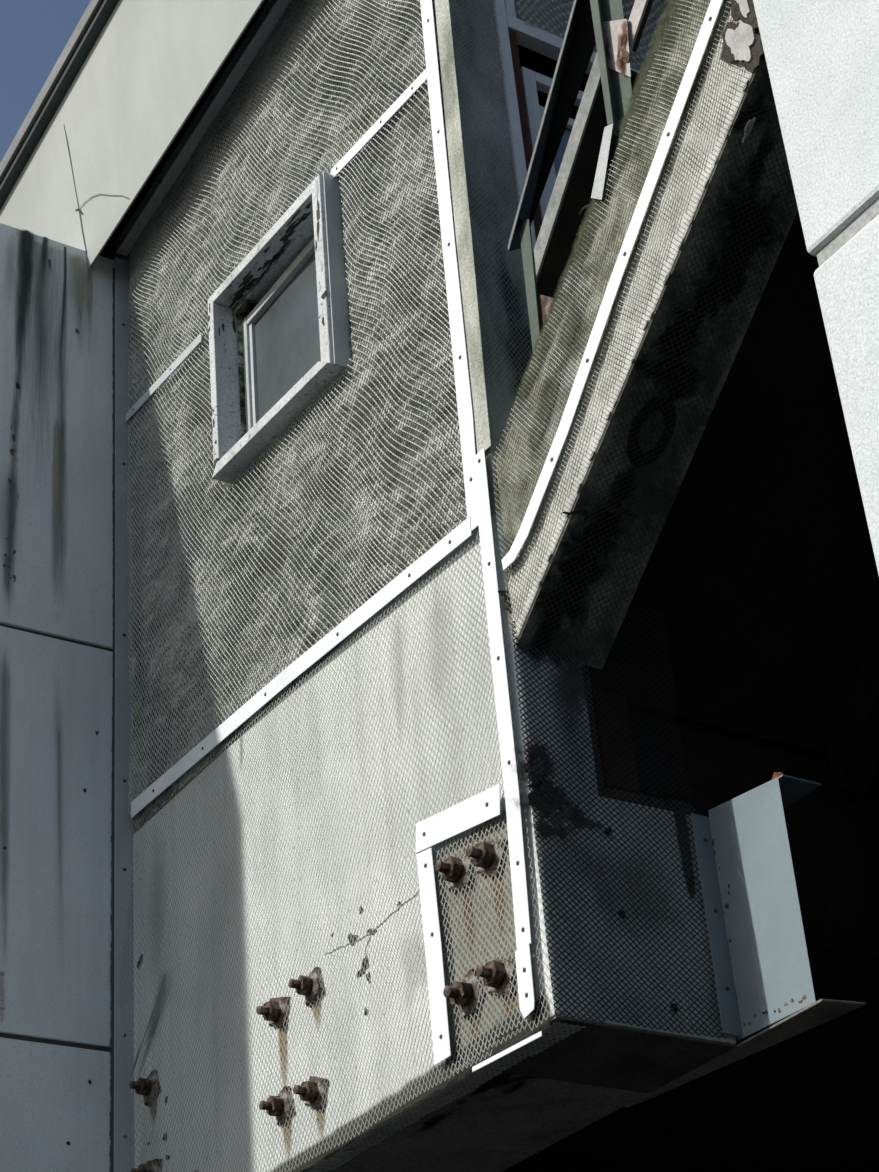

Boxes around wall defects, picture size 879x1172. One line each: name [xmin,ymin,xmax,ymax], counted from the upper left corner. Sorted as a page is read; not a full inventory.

flaking render [720,0,764,92]
damp [730,94,768,131]
peeling [208,180,327,336]
damp [16,230,92,408]
damp [528,137,782,654]
damp [3,420,19,585]
damp [53,424,63,549]
crack [324,889,420,963]
corrosion [461,889,472,944]
corrosion [492,878,503,929]
corrosion [278,1026,286,1079]